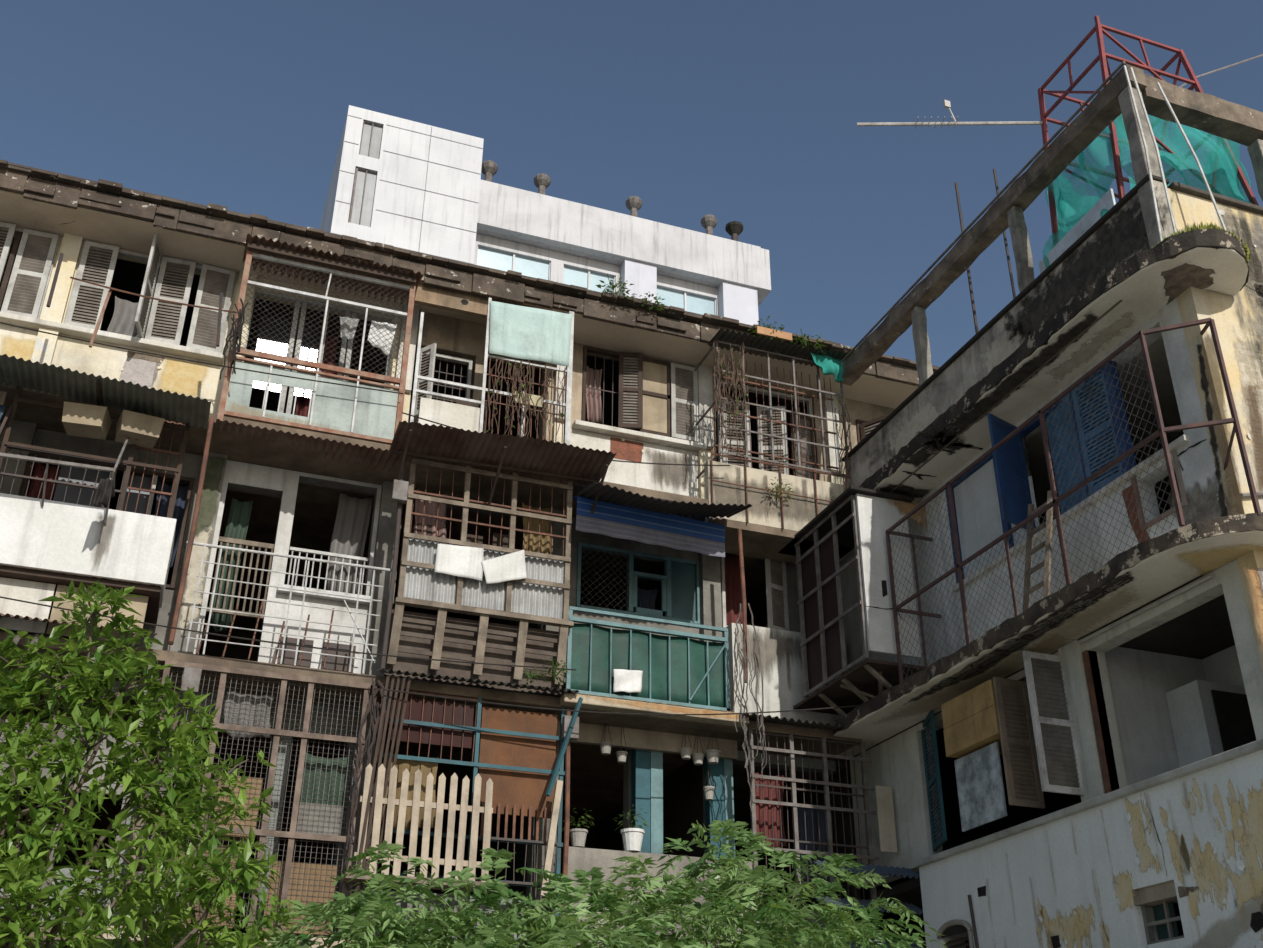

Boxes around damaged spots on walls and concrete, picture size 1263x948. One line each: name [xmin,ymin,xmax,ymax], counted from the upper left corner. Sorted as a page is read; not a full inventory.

damp [1004,200,1150,340]
spalling [1161,263,1216,305]
damp [1222,208,1263,363]
damp [902,314,1098,467]
peeling [1037,890,1110,948]
peeling [1113,779,1263,948]